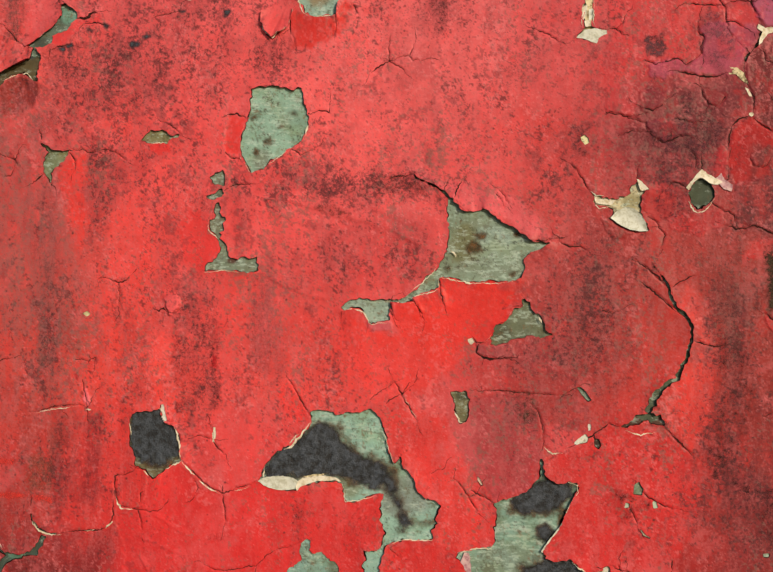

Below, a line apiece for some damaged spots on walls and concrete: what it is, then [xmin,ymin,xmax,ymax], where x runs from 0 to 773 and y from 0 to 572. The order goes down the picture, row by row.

peeling [0,0,92,97]
peeling [260,0,359,50]
crack [606,0,773,181]
peeling [195,76,320,286]
peeling [582,169,662,243]
crack [711,201,773,234]
peeling [331,189,565,358]
crack [568,181,726,454]
crack [27,465,168,541]
peeling [120,402,193,500]
crack [182,460,253,538]
peeling [249,399,625,572]